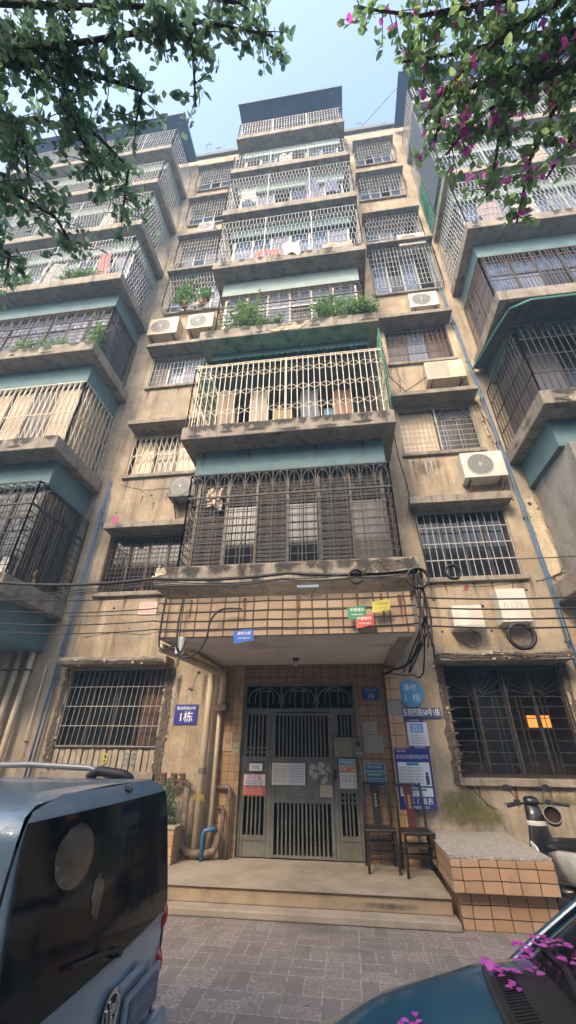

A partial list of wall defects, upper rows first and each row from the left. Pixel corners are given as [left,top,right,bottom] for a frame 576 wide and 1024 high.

flaking render [42,657,179,781]
flaking render [432,649,576,786]